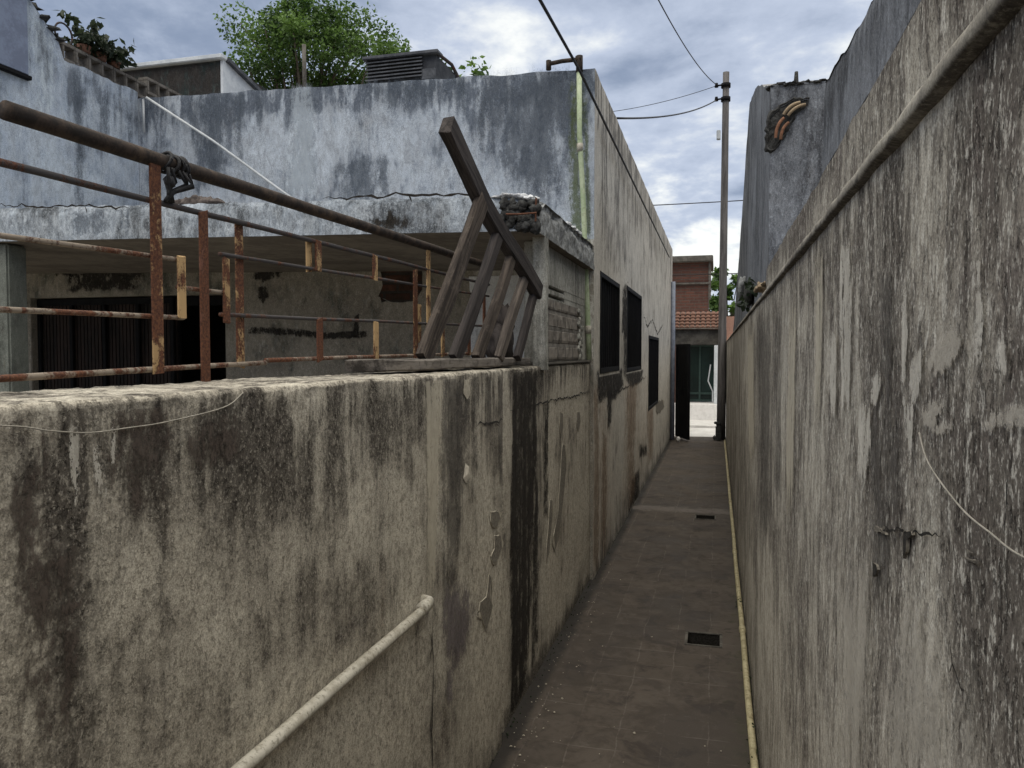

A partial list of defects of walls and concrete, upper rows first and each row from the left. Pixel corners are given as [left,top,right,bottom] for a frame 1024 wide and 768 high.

leakage [372,210,413,229]
crack [323,192,469,202]
leakage [478,72,590,233]
leakage [814,240,881,484]
leakage [901,277,921,468]
leakage [973,260,983,363]
leakage [998,345,1006,375]
leakage [92,407,172,512]
leakage [10,430,81,750]
peeling [477,511,503,632]
leakage [509,371,549,712]
crack [874,526,940,537]